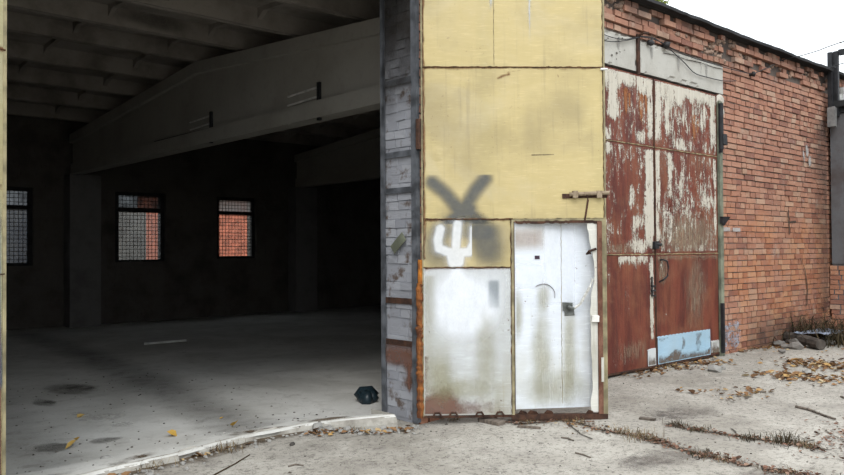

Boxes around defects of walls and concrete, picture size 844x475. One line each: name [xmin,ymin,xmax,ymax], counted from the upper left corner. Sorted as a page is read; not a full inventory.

spalling [649,29,827,86]
rust [624,88,647,119]
peeling [605,69,740,339]
rust [425,392,476,414]